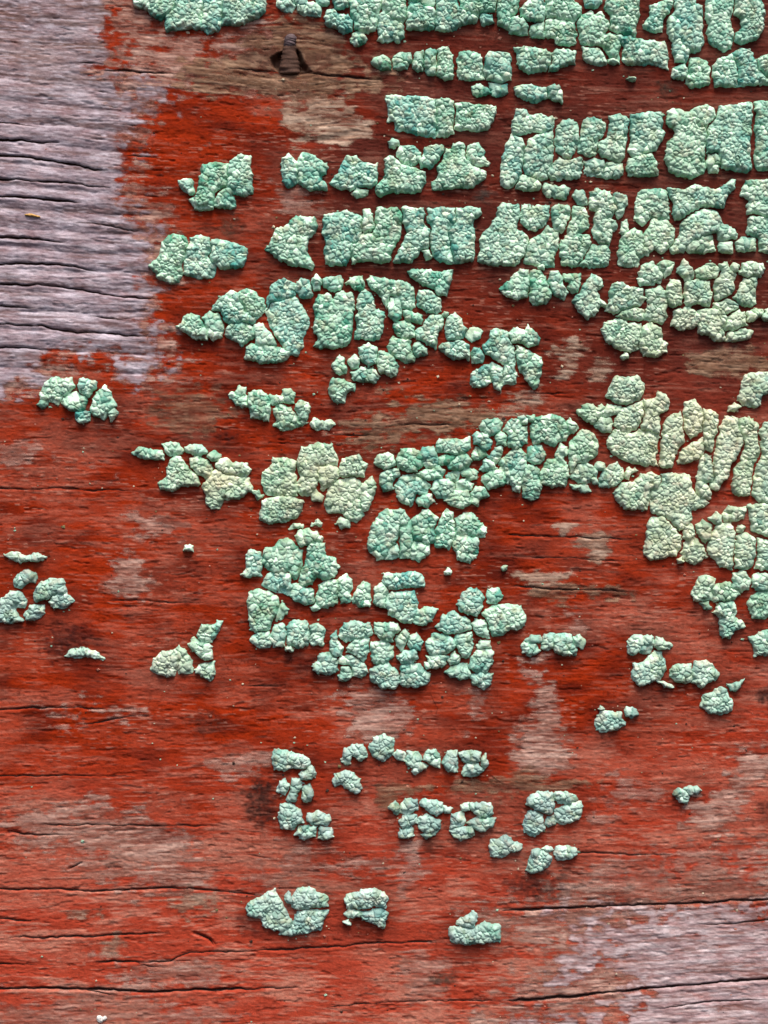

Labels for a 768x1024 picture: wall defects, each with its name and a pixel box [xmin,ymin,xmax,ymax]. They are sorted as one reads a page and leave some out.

crack [309,72,384,80]
peeling [0,0,768,795]
crack [508,534,628,561]
peeling [501,565,636,837]
peeling [672,743,768,839]
peeling [0,794,217,922]
crack [0,887,258,895]
crack [0,918,431,996]
peeling [244,748,391,937]
crack [330,978,768,1009]
peeling [375,783,768,1024]
crack [502,898,768,925]